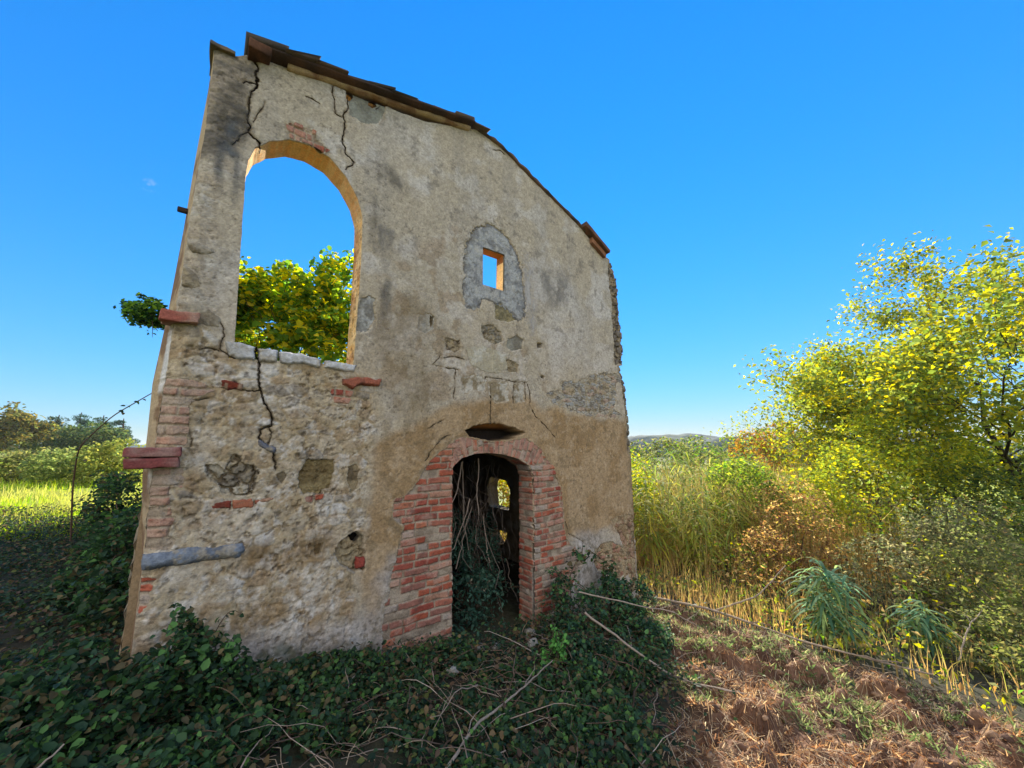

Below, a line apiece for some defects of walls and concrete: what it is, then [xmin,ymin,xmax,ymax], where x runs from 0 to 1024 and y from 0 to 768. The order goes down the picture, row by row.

crack [232,62,264,154]
peeling [286,122,330,153]
crack [306,88,354,170]
peeling [356,296,375,332]
flaking render [156,378,214,445]
crack [202,323,276,470]
spalling [208,455,259,496]
spalling [276,459,334,502]
spalling [334,532,363,568]